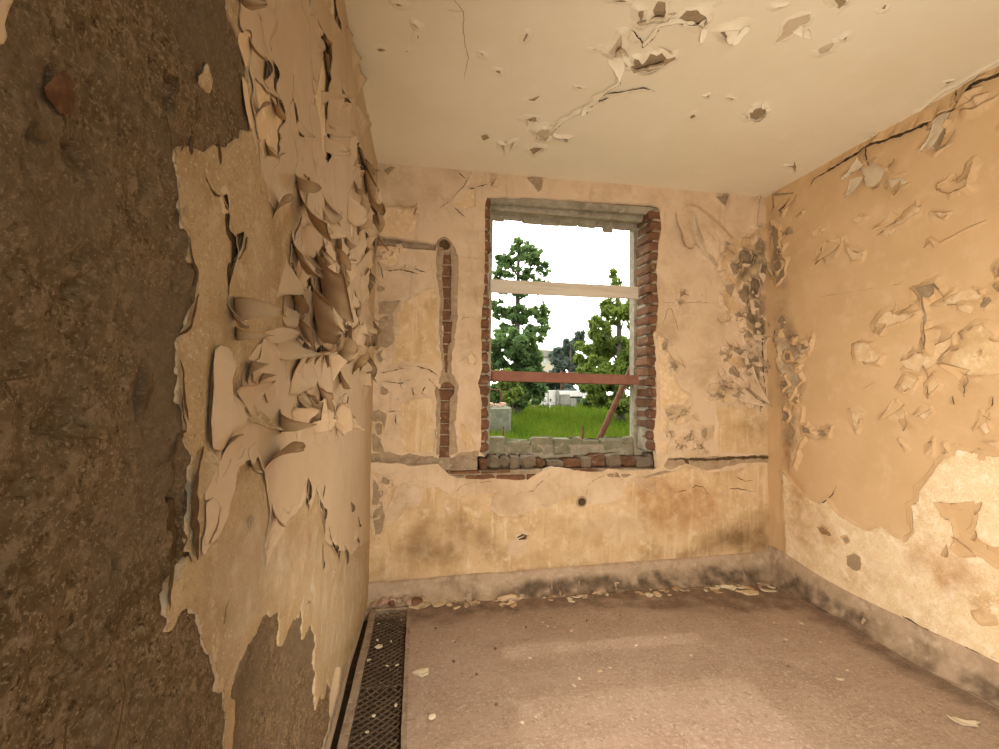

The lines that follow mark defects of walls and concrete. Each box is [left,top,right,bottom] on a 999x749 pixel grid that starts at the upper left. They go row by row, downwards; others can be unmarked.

crack [451,0,469,79]
peeling [767,0,856,58]
crack [808,58,999,188]
peeling [920,101,956,158]
peeling [841,154,984,236]
flaking render [0,0,797,749]
peeling [772,310,999,663]
water stain [519,572,674,598]
water stain [689,569,758,587]
peeling [946,714,981,727]